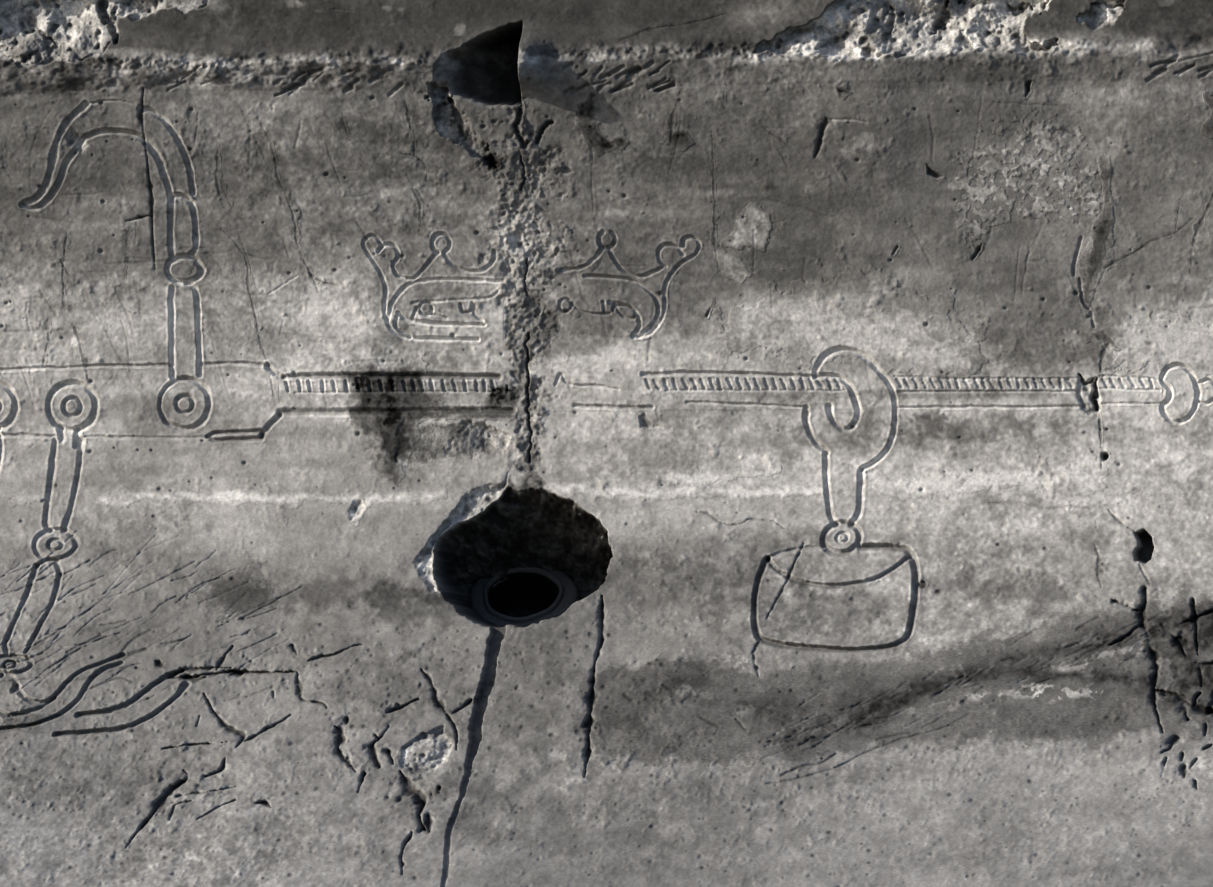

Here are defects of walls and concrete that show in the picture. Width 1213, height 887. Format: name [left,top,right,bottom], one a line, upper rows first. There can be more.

spalling [0,0,214,69]
spalling [752,0,1065,63]
spalling [424,79,489,159]
crack [1097,343,1112,374]
leakage [96,353,519,527]
crack [1096,412,1104,452]
leakage [8,489,59,508]
crack [988,482,1153,608]
crack [582,595,607,778]
crack [125,642,475,876]
crack [1159,738,1213,790]